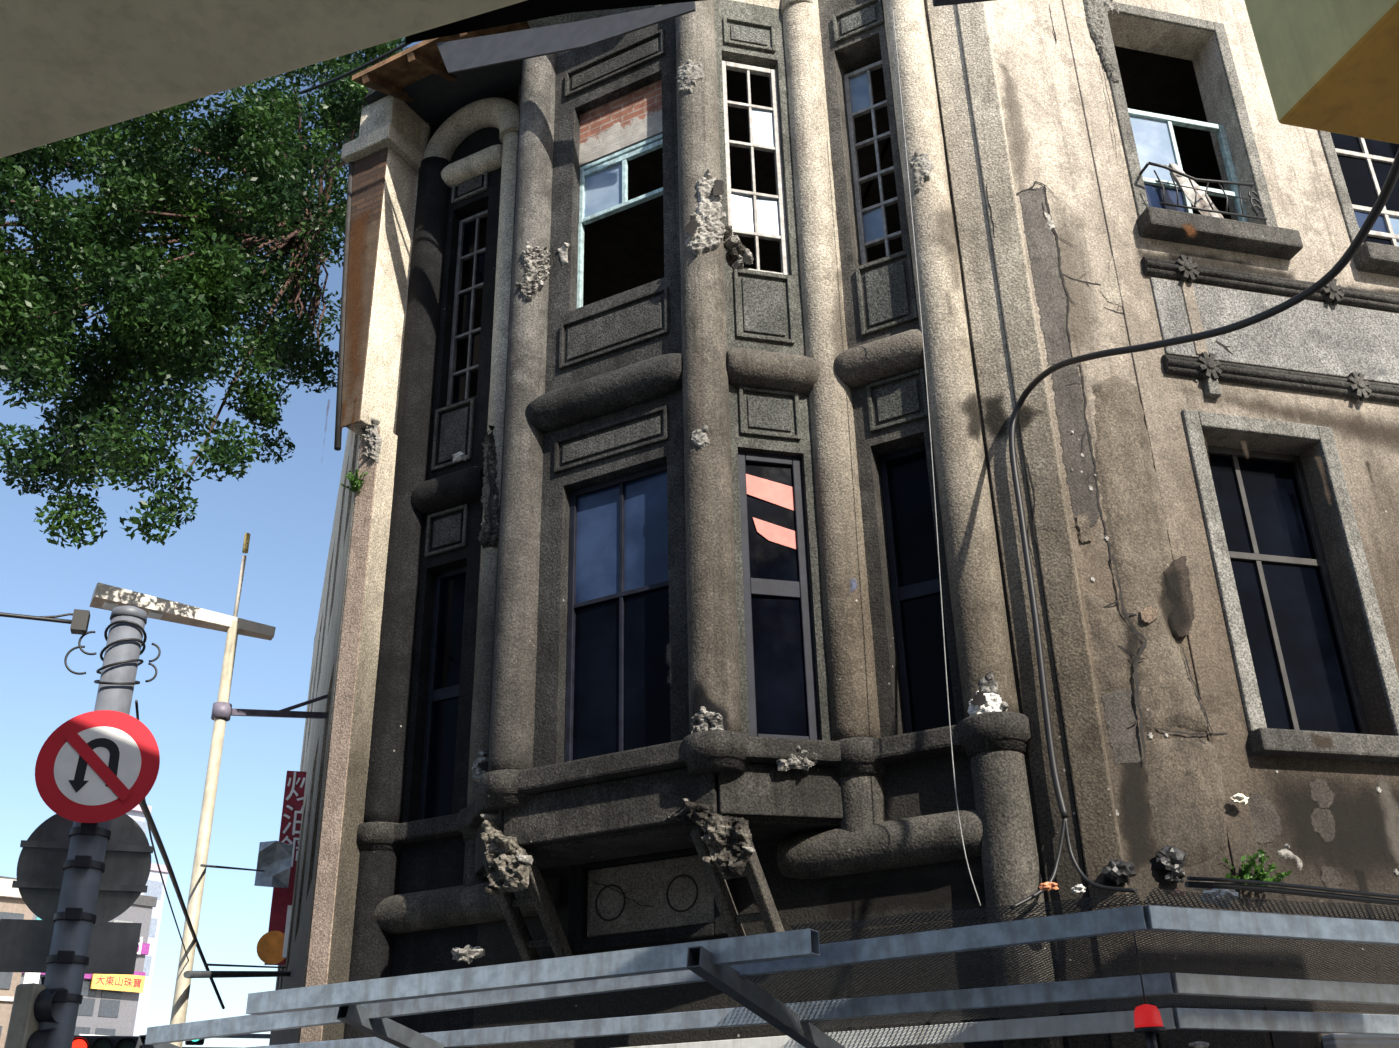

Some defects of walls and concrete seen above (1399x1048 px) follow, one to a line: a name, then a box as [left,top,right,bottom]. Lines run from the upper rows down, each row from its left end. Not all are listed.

spalling [910,150,934,194]
spalling [684,169,754,270]
spalling [516,242,570,301]
spalling [478,425,500,549]
crack [986,181,1228,762]
leakage [1164,570,1189,634]
spalling [967,672,1009,716]
spalling [776,745,818,771]
spalling [480,814,533,897]
spalling [667,798,755,880]